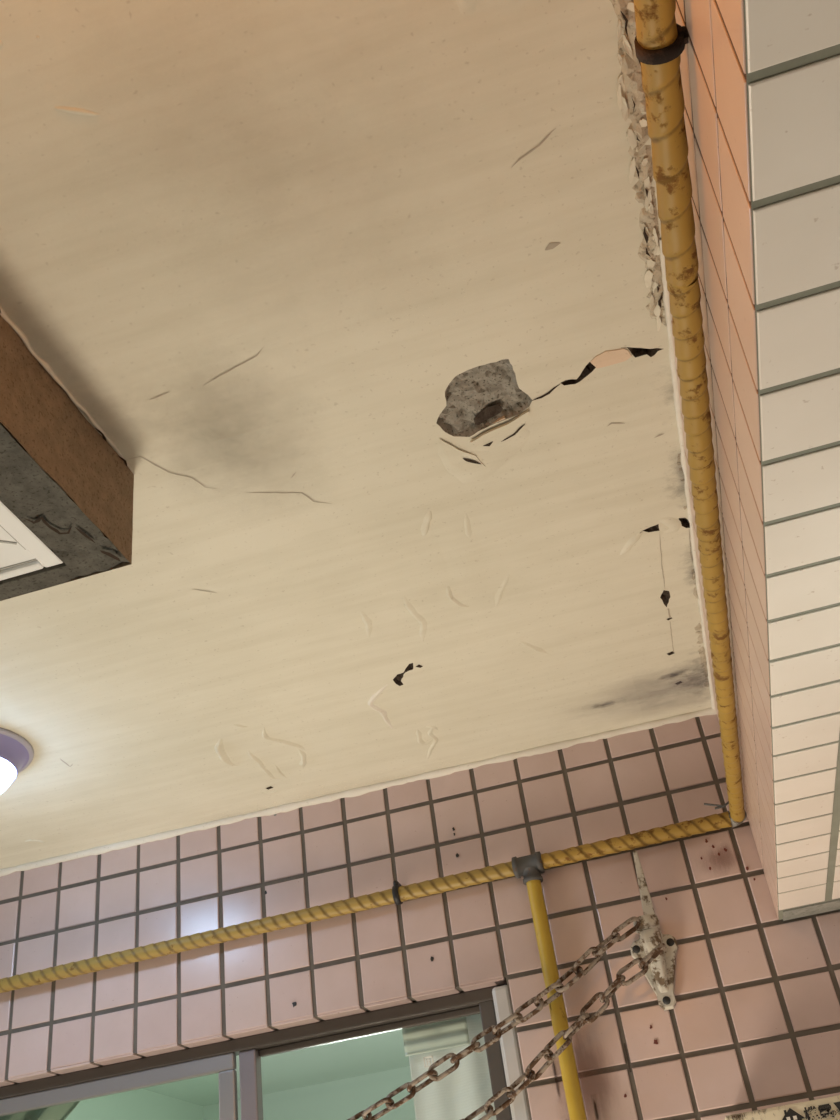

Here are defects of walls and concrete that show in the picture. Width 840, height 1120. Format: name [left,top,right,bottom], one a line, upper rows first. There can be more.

flaking render [610,0,667,331]
crack [532,347,662,401]
spalling [436,359,532,483]
crack [620,517,693,587]
flaking render [694,623,709,687]
peeling [368,663,423,729]